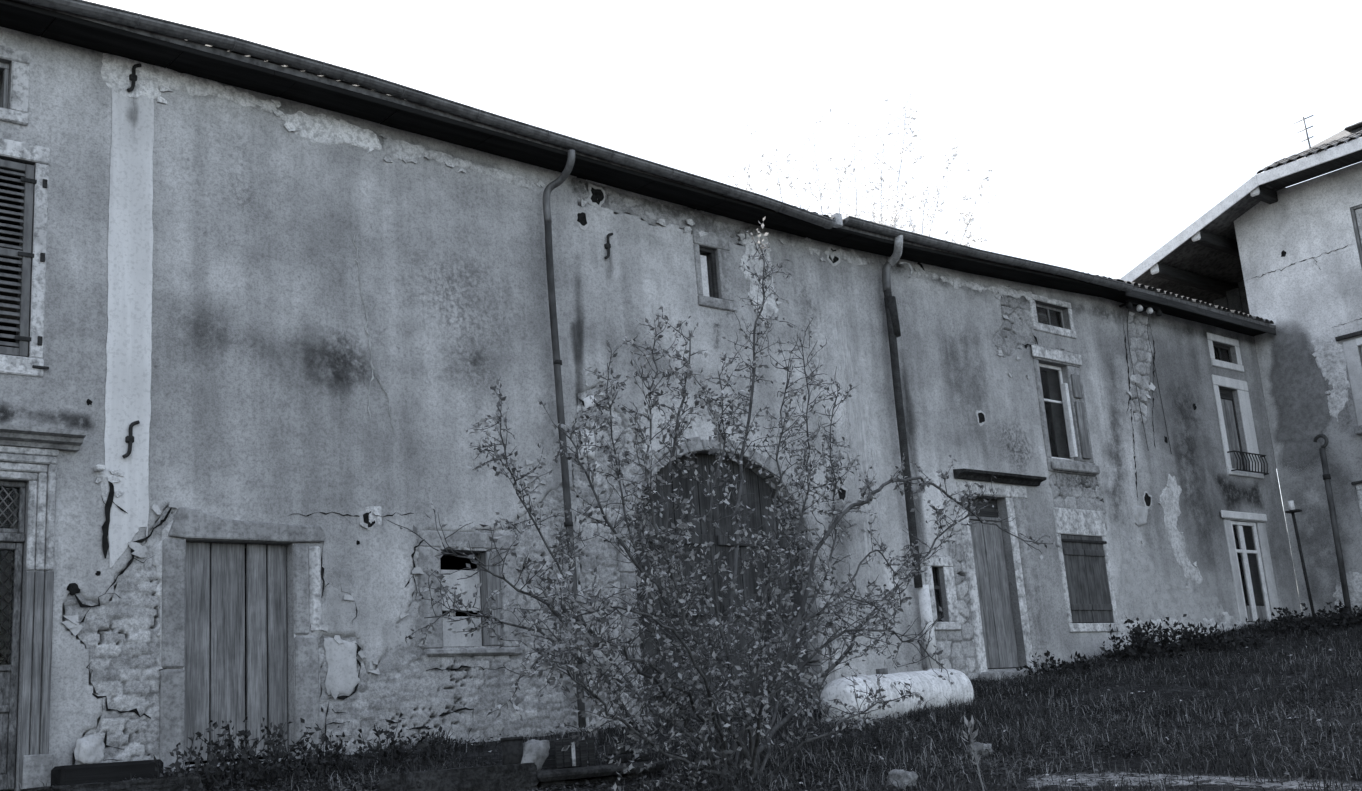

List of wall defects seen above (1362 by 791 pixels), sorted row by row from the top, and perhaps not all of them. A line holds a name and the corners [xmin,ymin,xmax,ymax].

flaking render [101,53,545,191]
crack [1245,244,1352,281]
water stain [0,405,14,421]
water stain [62,415,90,427]
water stain [573,312,581,362]
water stain [1271,327,1330,471]
flaking render [1310,334,1350,422]
flaking render [1114,474,1246,651]
crack [288,512,425,755]
flaking render [321,612,427,700]
crack [426,664,506,672]
crack [383,707,474,739]